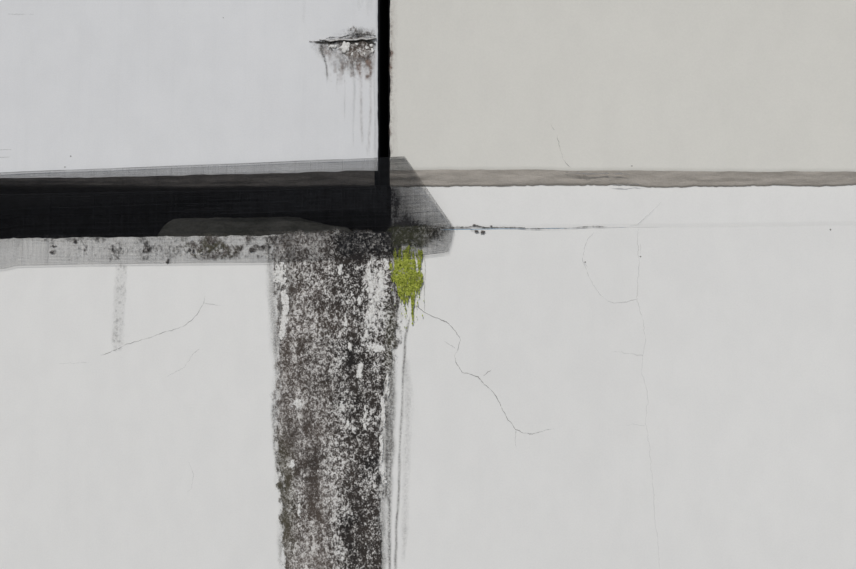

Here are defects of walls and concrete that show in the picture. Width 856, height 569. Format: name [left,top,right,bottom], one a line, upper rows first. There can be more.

spalling [309,26,376,78]
leakage [273,228,409,569]
crack [417,306,549,445]